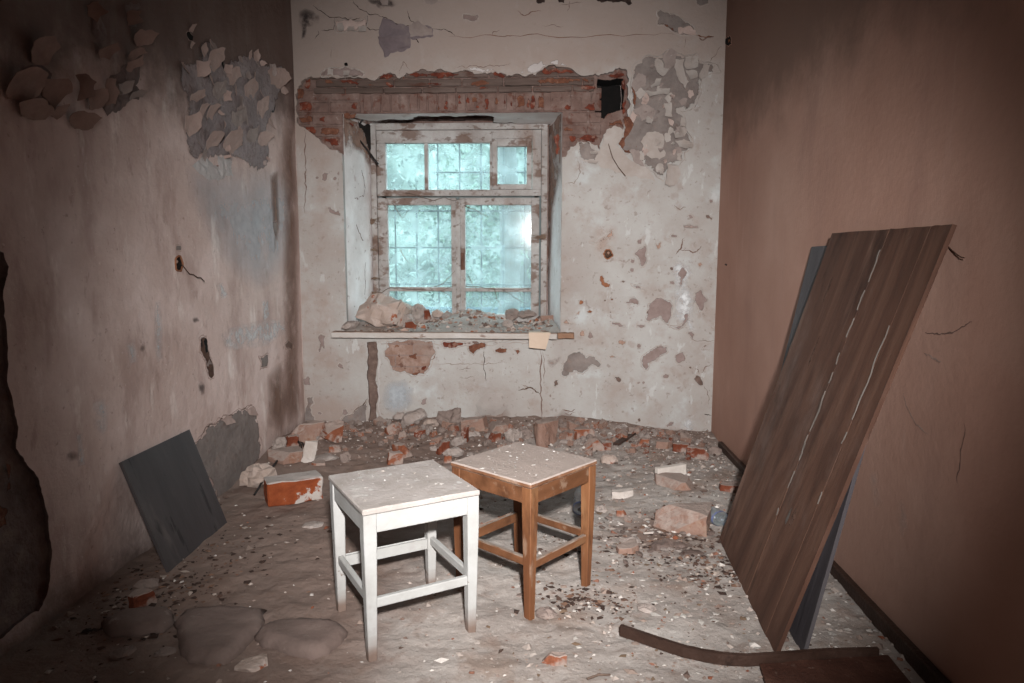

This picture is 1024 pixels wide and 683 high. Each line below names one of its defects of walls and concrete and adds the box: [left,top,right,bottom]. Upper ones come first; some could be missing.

crack [315,1,720,71]
peeling [5,36,148,130]
flaking render [181,24,722,269]
flaking render [199,335,215,380]
flaking render [380,338,529,377]
flaking render [549,233,710,404]
crack [924,322,970,362]
flaking render [195,405,262,497]